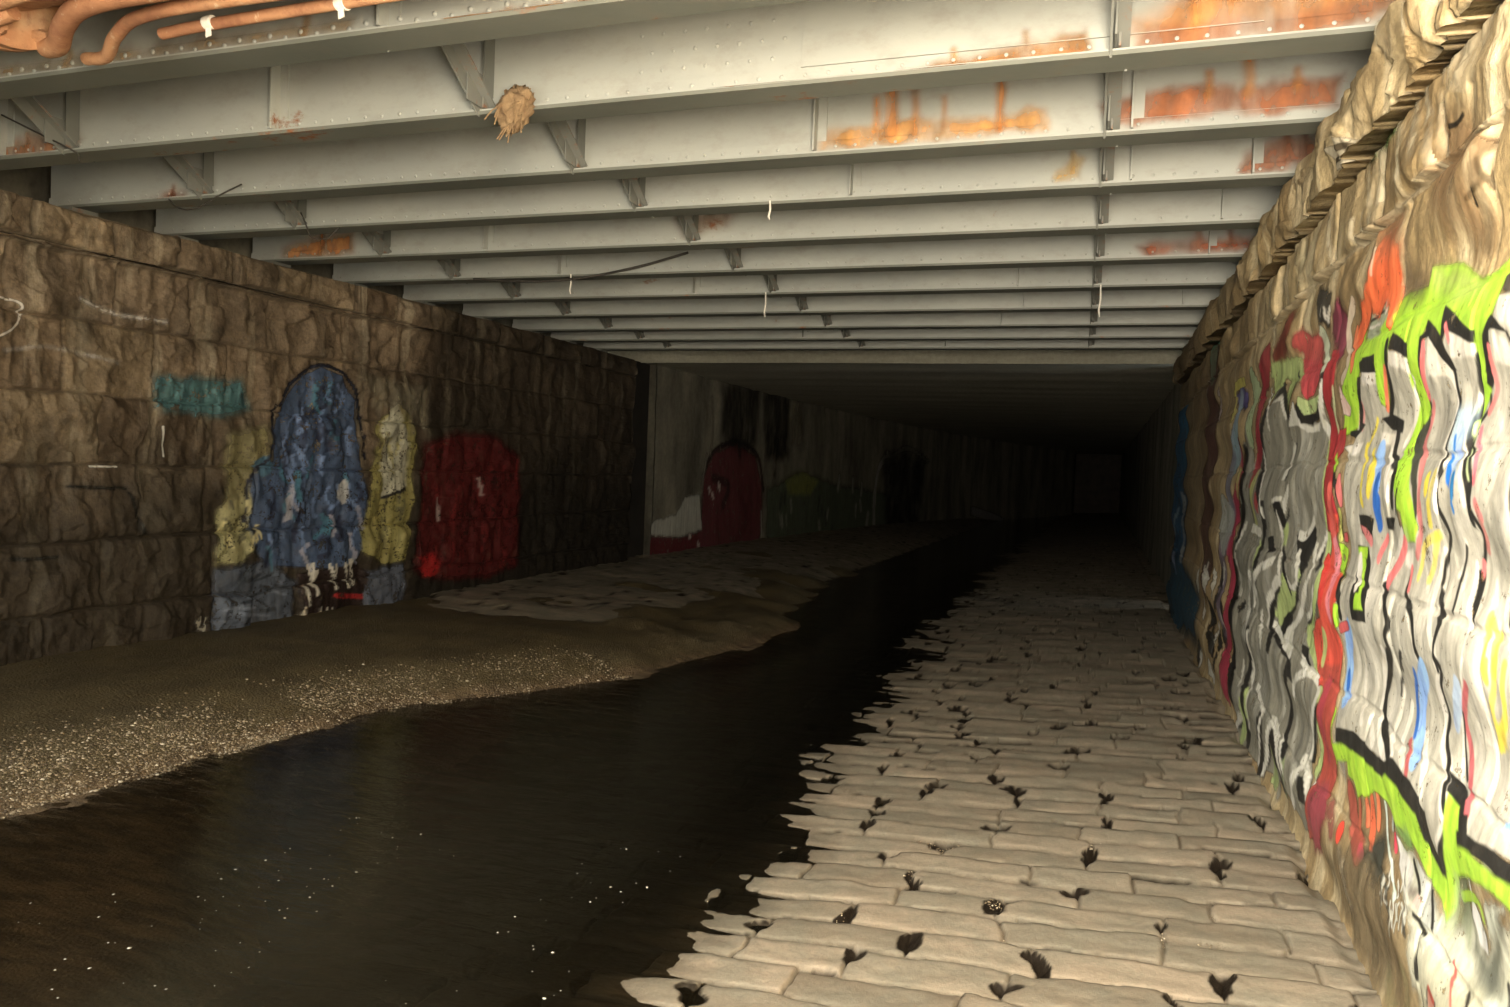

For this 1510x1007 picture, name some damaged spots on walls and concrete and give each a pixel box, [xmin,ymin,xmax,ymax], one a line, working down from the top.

rust [1141,0,1393,45]
rust [923,34,1089,68]
rust [833,82,1041,147]
rust [1121,73,1337,122]
rust [1241,135,1315,173]
rust [288,234,352,258]